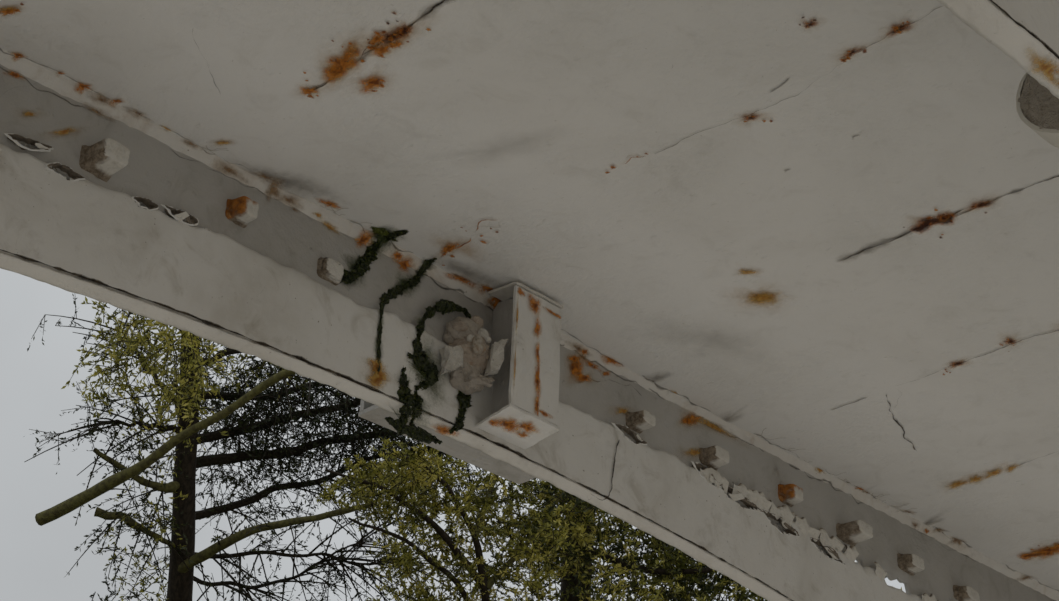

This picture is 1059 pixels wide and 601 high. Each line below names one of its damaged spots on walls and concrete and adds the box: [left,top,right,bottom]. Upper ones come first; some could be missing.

corrosion [325,12,411,82]
corrosion [361,77,385,92]
corrosion [1033,58,1059,84]
spalling [0,133,86,181]
corrosion [489,288,561,437]
corrosion [569,345,620,381]
crack [0,249,794,601]
corrosion [950,466,1016,488]
peeling [691,461,859,565]
corrosion [1020,543,1059,560]